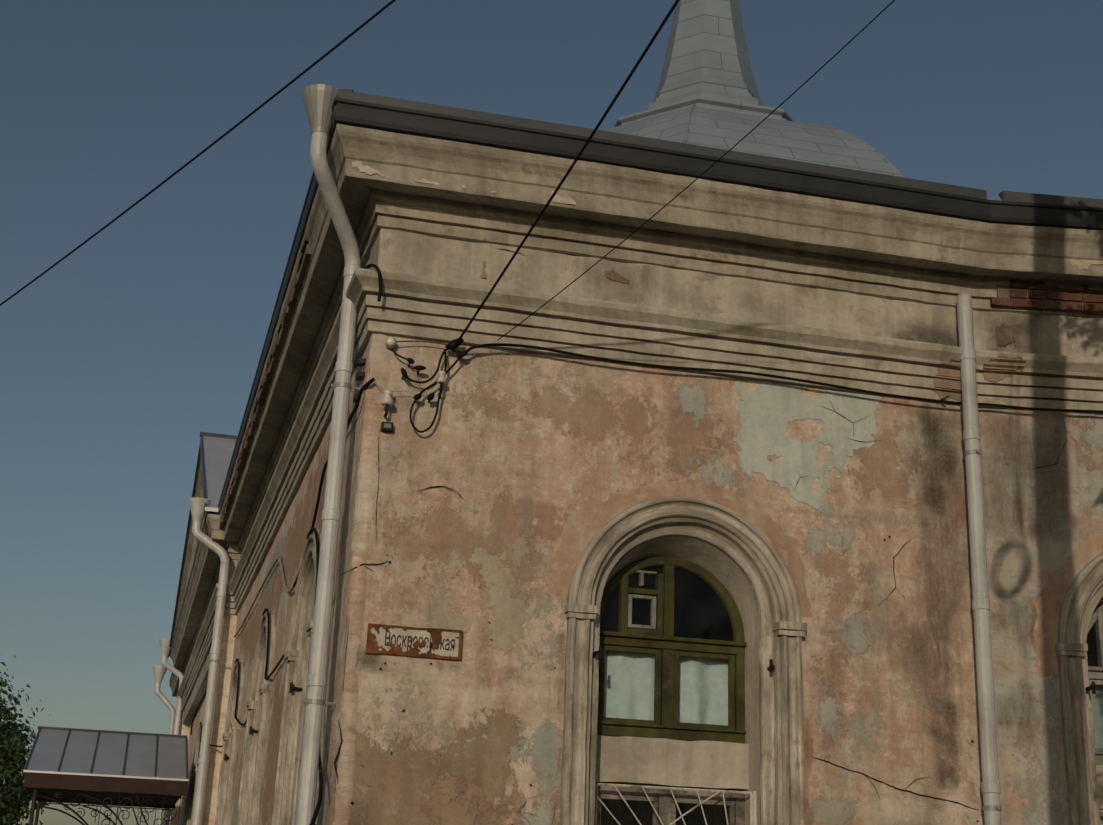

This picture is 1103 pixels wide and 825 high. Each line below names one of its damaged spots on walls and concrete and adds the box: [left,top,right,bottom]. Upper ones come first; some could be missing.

peeling [1069,259,1103,270]
flaking render [990,279,1103,317]
flaking render [980,325,1026,382]
peeling [667,376,715,429]
flaking render [932,359,962,402]
peeling [681,381,882,566]
crack [813,757,979,810]